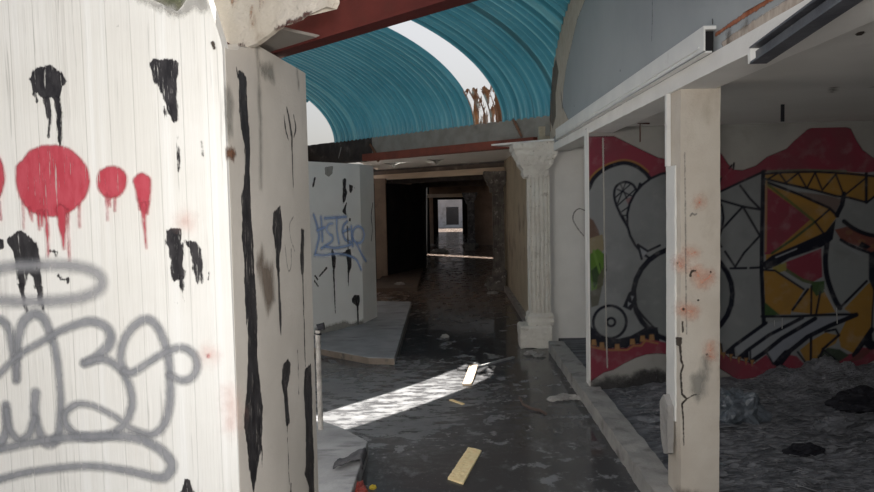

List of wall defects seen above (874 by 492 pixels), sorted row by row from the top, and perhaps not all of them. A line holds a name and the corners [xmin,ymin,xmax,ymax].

spalling [275,11,311,31]
rust [715,0,773,36]
crack [676,322,697,444]